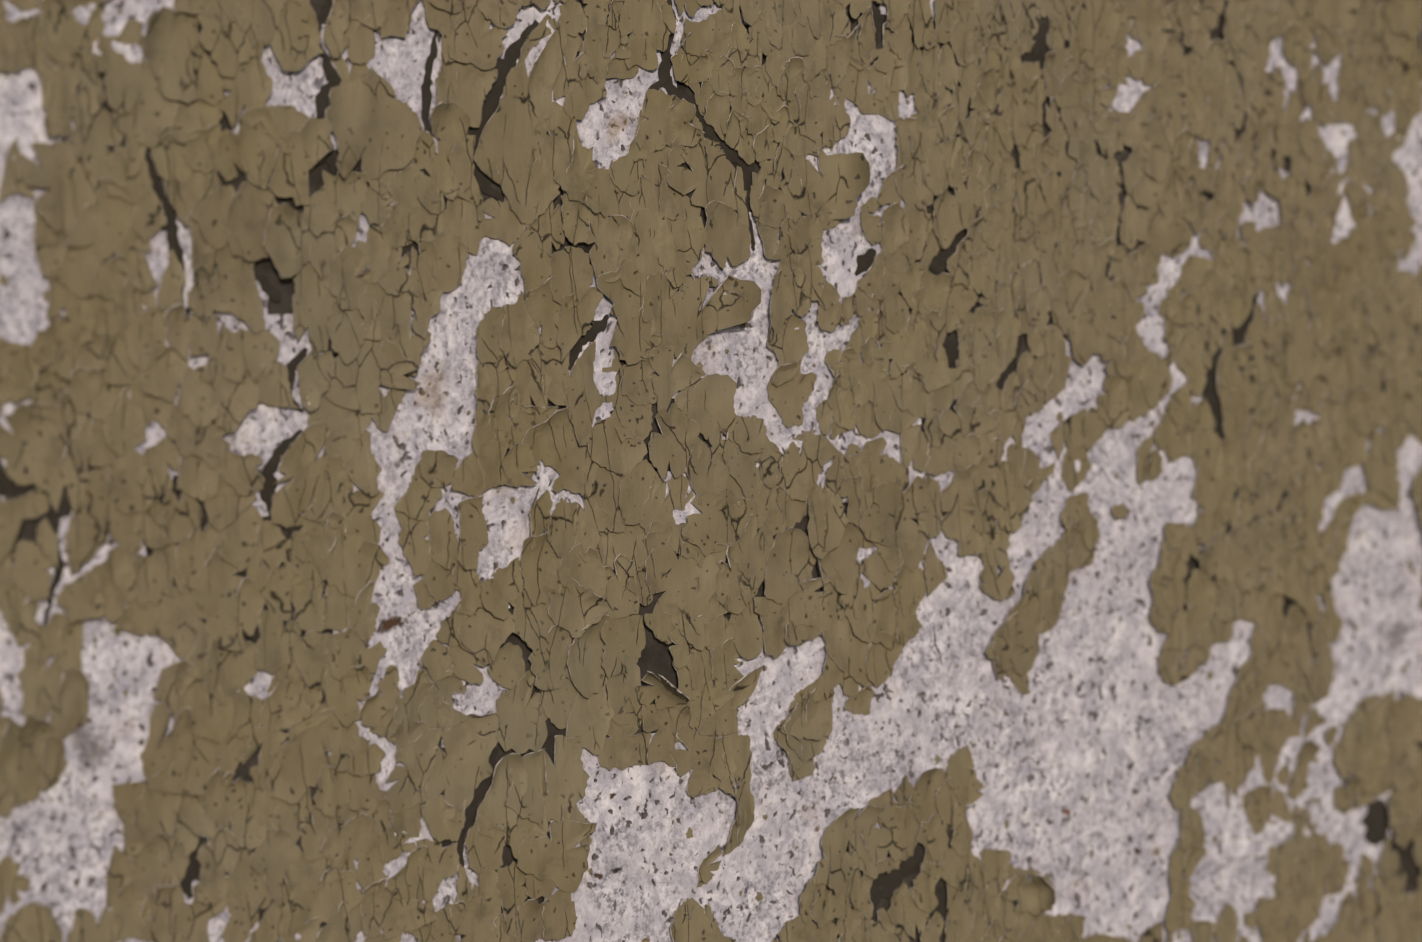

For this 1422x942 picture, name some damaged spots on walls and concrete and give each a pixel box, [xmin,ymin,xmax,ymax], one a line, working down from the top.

crack [309,0,341,176]
crack [421,20,539,201]
crack [647,0,756,251]
peeling [670,0,871,110]
peeling [1109,74,1154,114]
crack [144,155,185,303]
peeling [648,75,871,512]
peeling [815,0,1105,484]
crack [259,347,308,532]
peeling [673,478,702,525]
peeling [928,470,954,494]
crack [1358,799,1416,885]